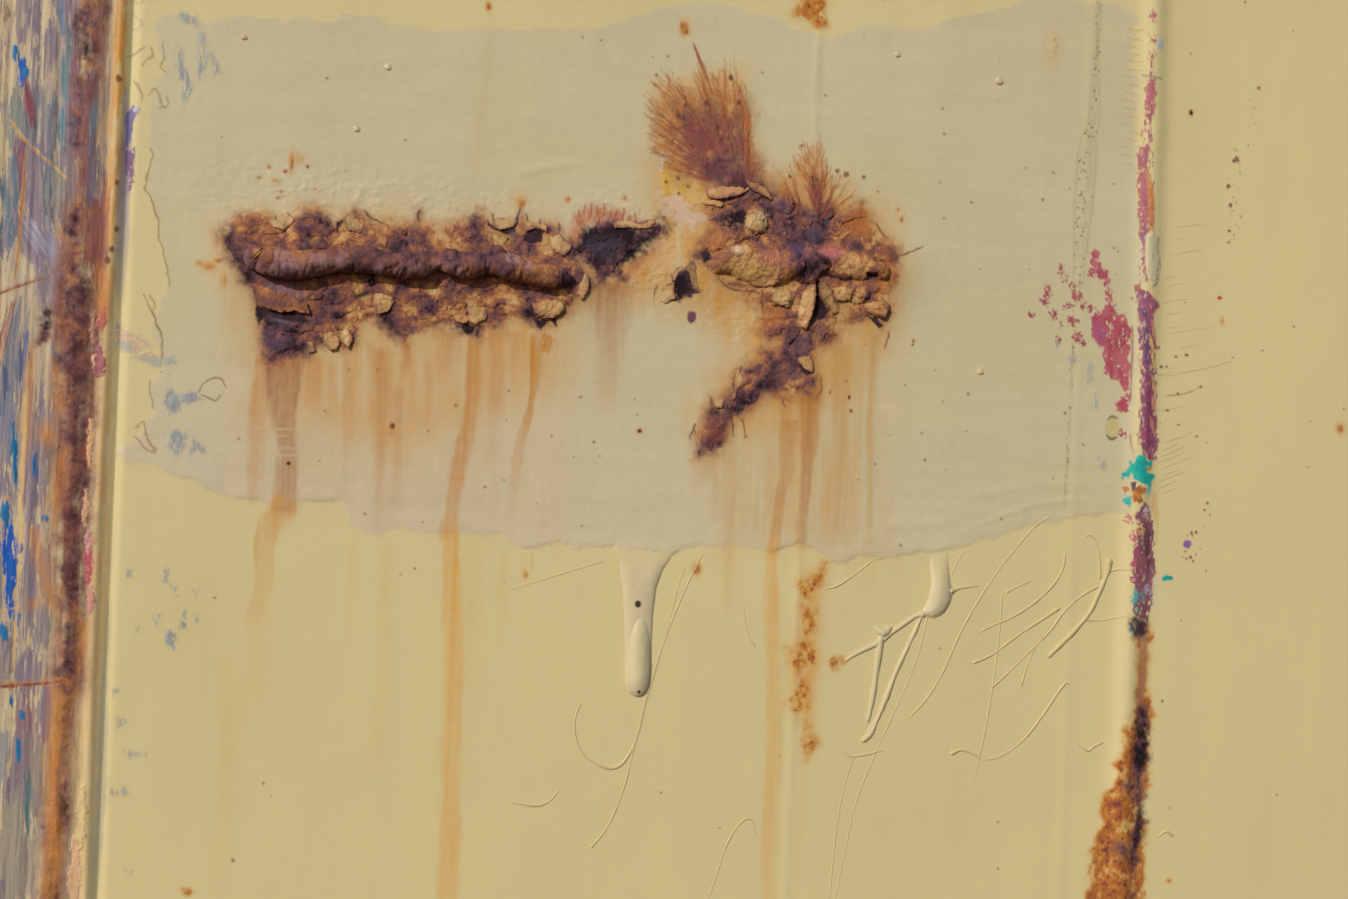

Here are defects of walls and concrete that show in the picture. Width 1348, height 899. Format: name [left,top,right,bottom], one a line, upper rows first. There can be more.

corrosion [785,0,837,34]
corrosion [0,0,132,899]
corrosion [191,14,924,899]
spalling [680,313,831,470]
corrosion [178,883,198,899]
corrosion [1081,607,1174,899]